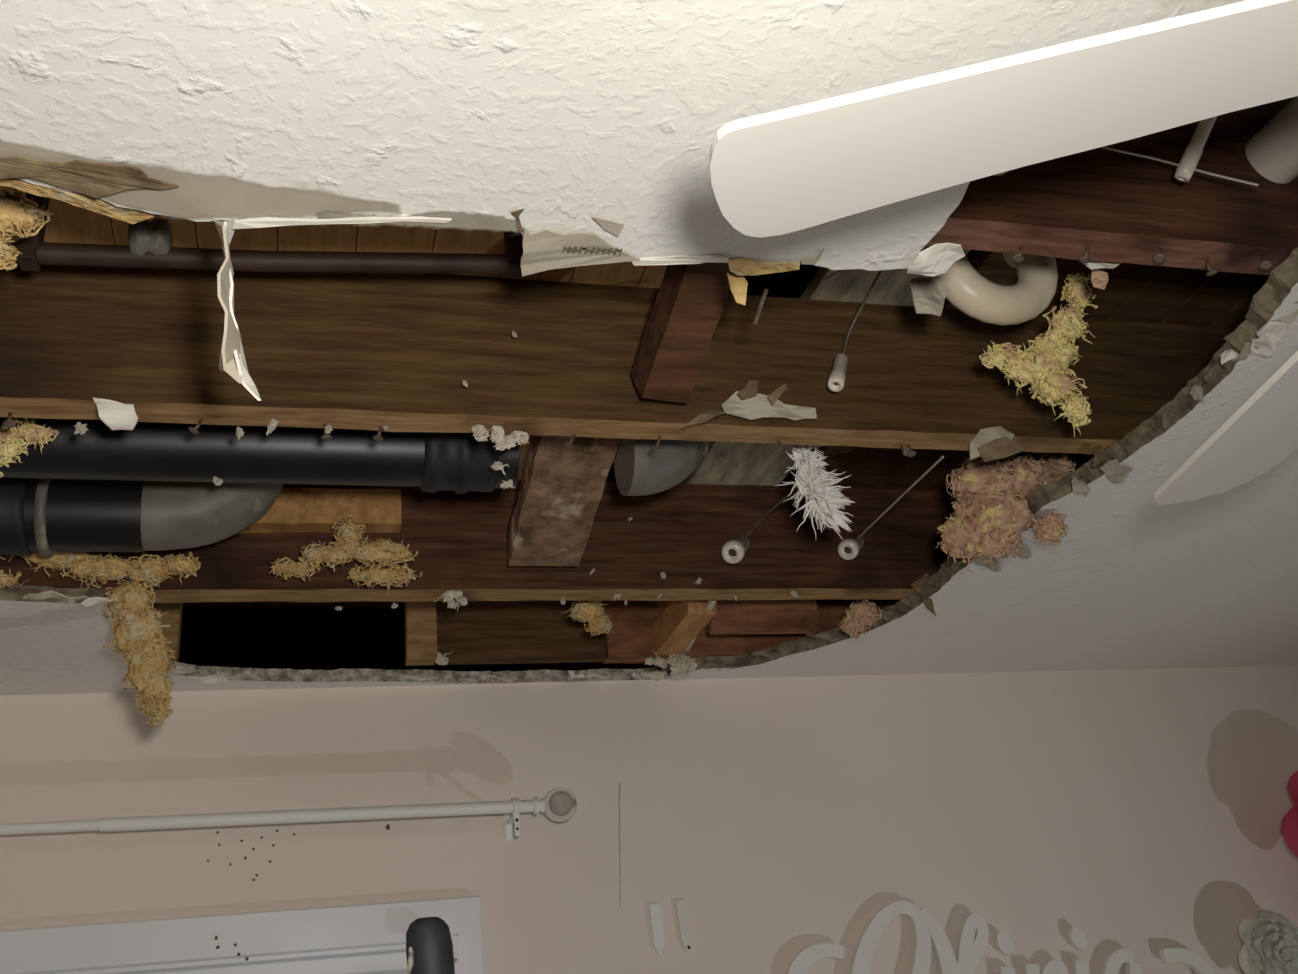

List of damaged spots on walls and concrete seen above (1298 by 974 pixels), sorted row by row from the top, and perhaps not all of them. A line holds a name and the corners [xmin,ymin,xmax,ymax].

peeling [0,141,518,231]
spalling [1190,301,1298,403]
spalling [93,398,138,430]
spalling [1092,448,1133,483]
spalling [951,544,1032,572]
spalling [23,590,118,607]
spalling [171,665,229,684]
spalling [640,670,672,681]